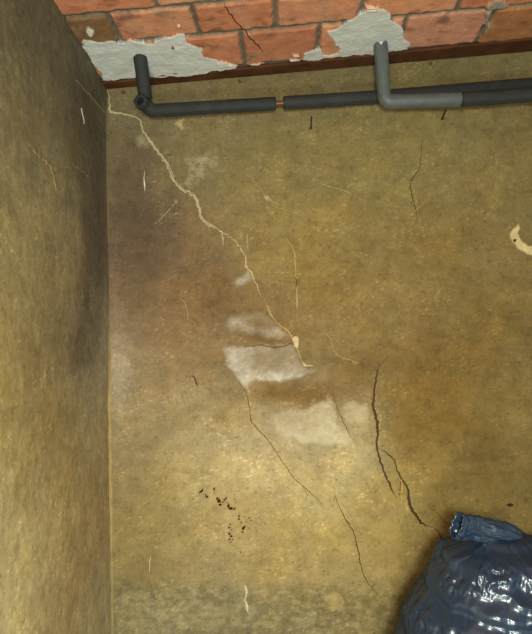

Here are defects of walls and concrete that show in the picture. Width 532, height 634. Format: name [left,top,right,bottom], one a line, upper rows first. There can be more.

peeling [81,24,238,81]
crack [224,2,263,52]
peeling [290,4,411,62]
crack [76,80,301,359]
water stain [230,266,254,288]
water stain [220,310,371,450]
crack [237,379,317,499]
crack [371,358,451,538]
crack [333,491,380,597]